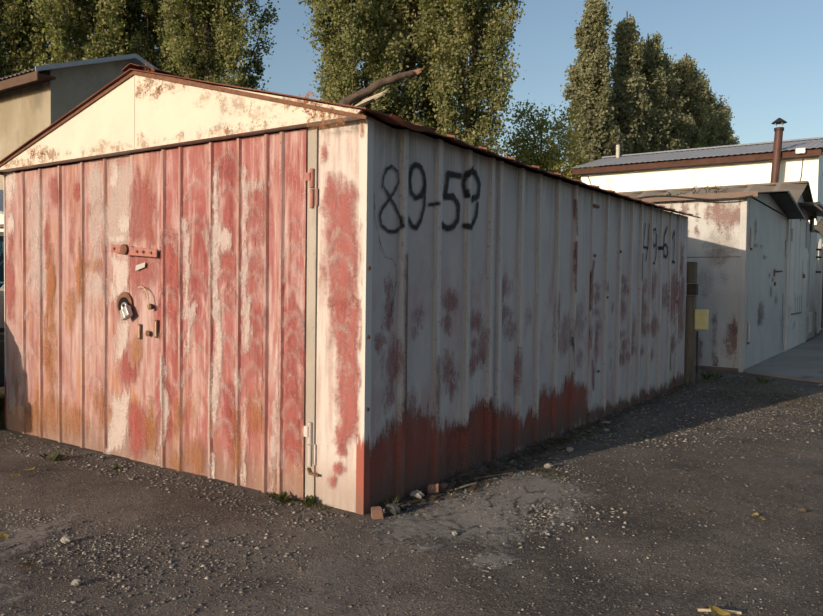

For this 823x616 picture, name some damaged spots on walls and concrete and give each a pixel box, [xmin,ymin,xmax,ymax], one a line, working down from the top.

rust [136,69,184,101]
rust [283,91,365,128]
peeling [5,173,16,319]
peeling [73,152,264,483]
peeling [322,175,361,486]
rust [696,200,741,233]